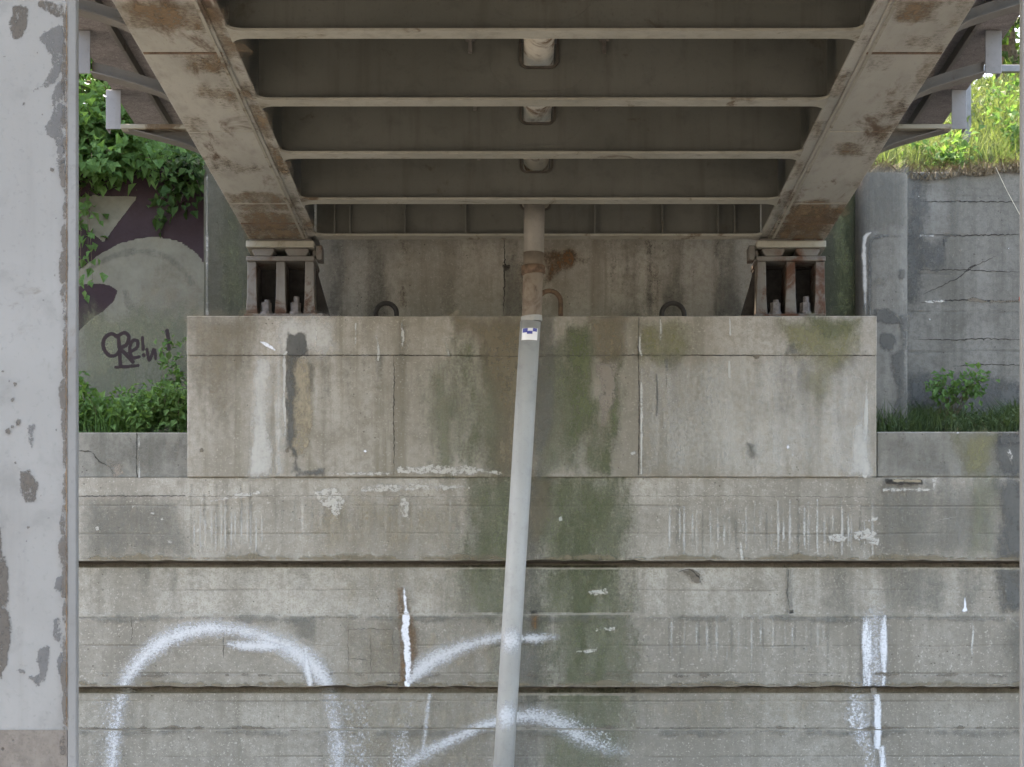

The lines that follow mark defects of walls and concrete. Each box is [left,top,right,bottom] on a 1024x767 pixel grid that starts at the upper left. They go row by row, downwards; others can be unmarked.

corrosion [122,0,202,30]
peeling [9,0,66,166]
corrosion [768,200,847,239]
crack [922,197,1012,205]
corrosion [544,249,576,281]
crack [919,234,1018,293]
water stain [563,327,618,475]
water stain [296,344,505,520]
peeling [20,470,39,502]
crack [80,450,122,478]
peeling [0,532,11,679]
peeling [19,618,63,686]